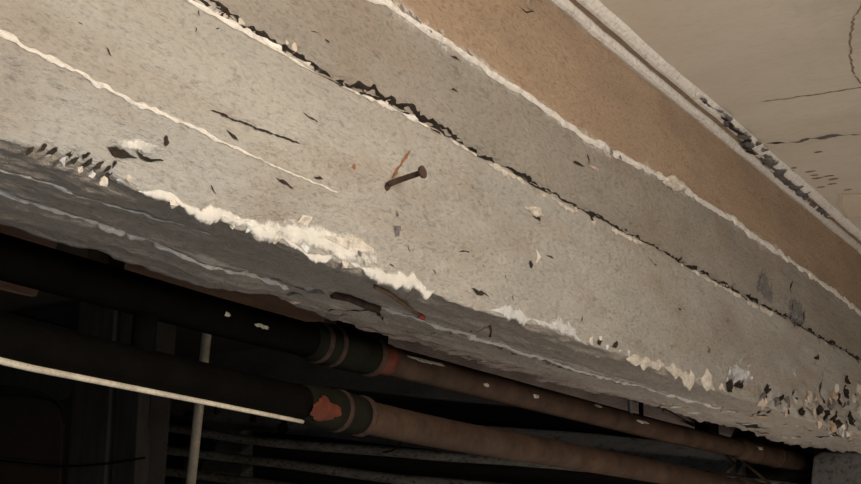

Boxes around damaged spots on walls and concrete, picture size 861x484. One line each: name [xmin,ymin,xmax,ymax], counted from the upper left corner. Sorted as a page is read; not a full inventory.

spalling [210,110,300,144]
spalling [25,135,169,187]
crack [193,0,861,360]
peeling [782,167,851,218]
peeling [139,189,435,299]
spalling [330,292,381,313]
spalling [325,313,651,403]
spalling [626,354,753,393]
spalling [660,375,861,451]